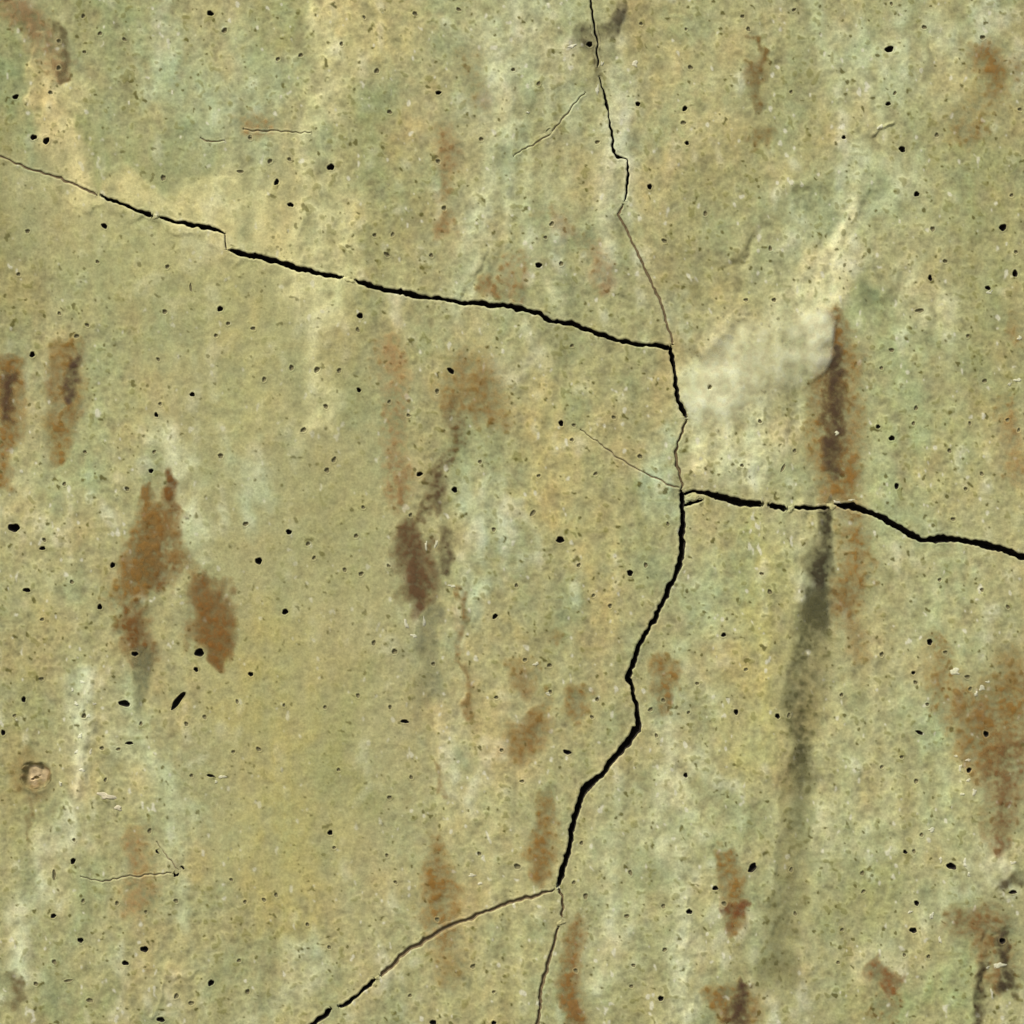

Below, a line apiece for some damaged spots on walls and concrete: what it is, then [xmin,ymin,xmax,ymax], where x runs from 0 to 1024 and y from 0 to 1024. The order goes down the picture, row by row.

crack [199,126,311,145]
crack [0,152,343,283]
corrosion [0,357,24,490]
corrosion [48,339,80,464]
corrosion [810,307,863,502]
corrosion [114,469,183,666]
corrosion [191,574,235,671]
corrosion [395,463,454,616]
crack [306,0,1024,1024]
water stain [785,499,855,794]
corrosion [934,660,1024,856]
crack [80,869,174,885]